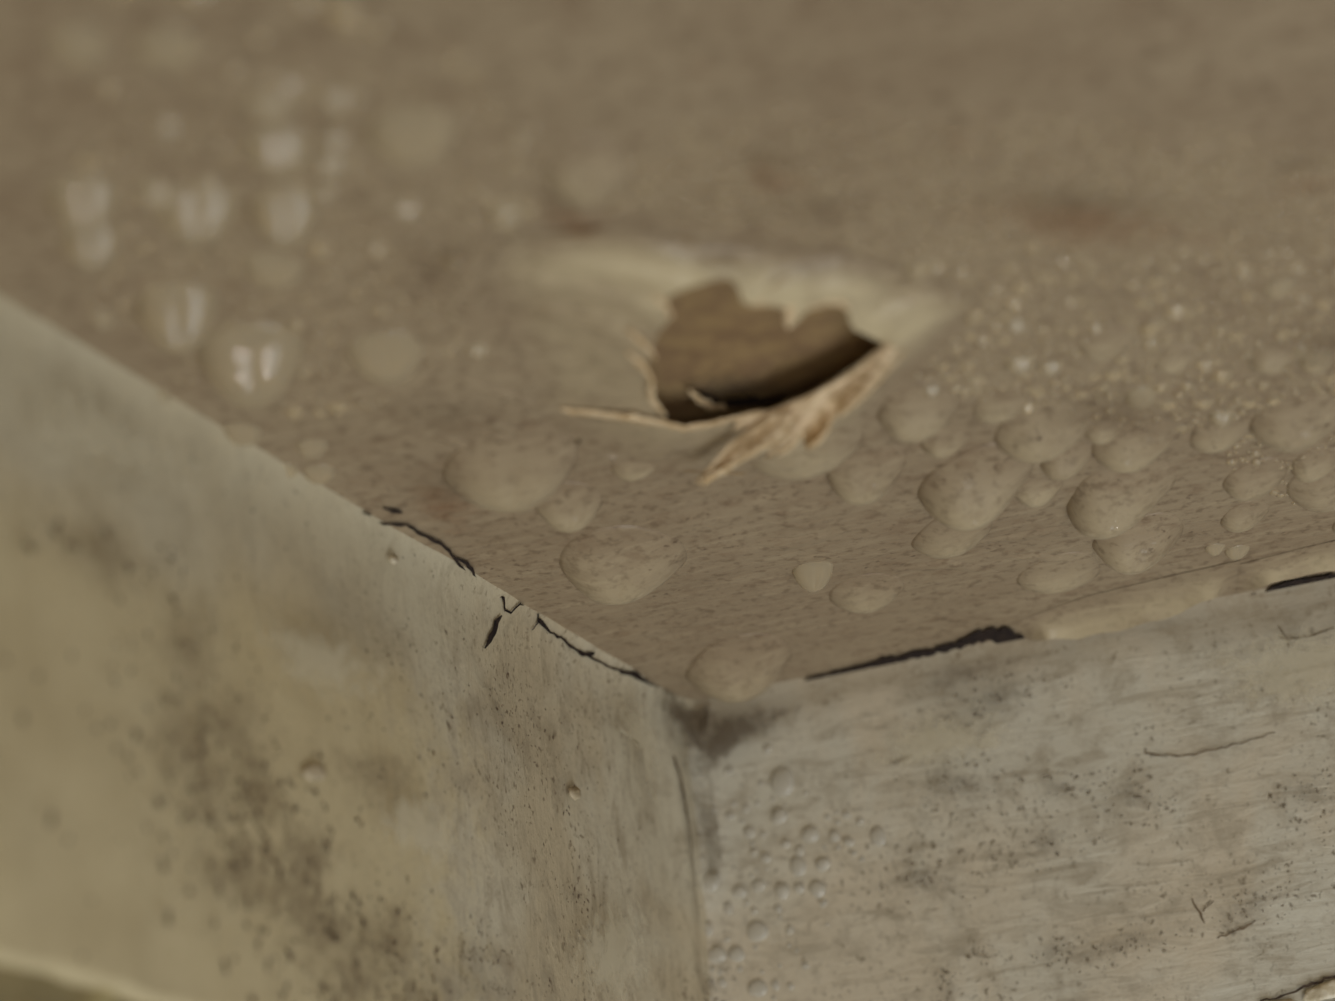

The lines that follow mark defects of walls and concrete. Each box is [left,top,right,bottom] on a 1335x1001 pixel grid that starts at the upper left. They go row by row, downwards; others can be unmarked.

crack [363,507,676,698]
crack [1251,574,1335,595]
crack [805,627,1025,681]
crack [1278,626,1334,647]
water stain [664,701,781,765]
crack [1144,732,1275,757]
water stain [912,751,1176,872]
peeling [1274,979,1335,1001]